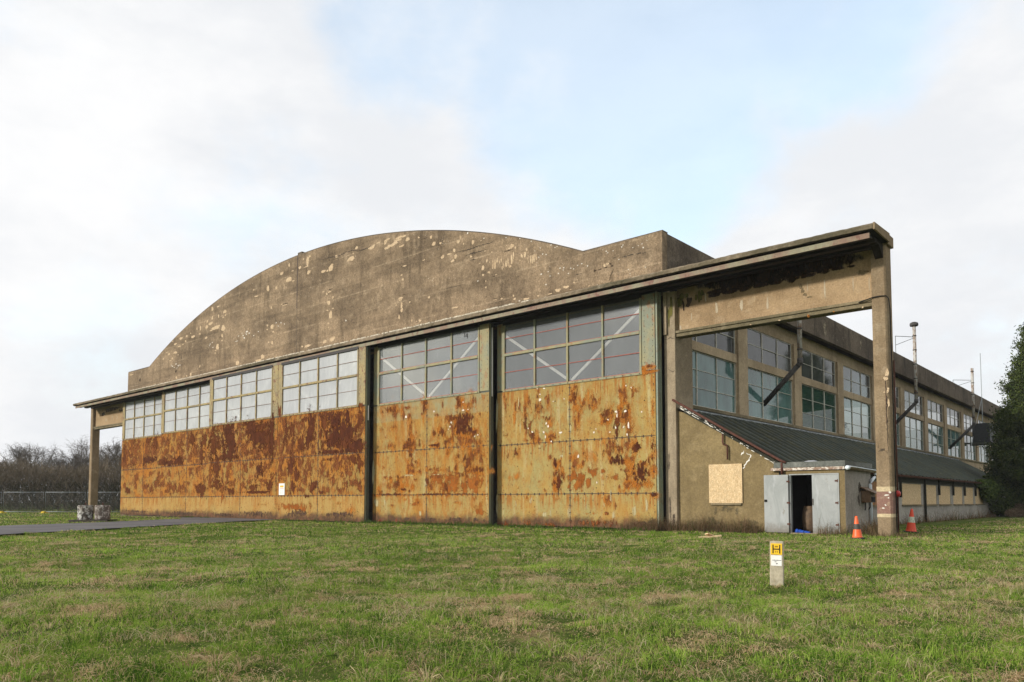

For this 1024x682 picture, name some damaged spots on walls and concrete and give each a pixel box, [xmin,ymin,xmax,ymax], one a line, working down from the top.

peeling [253,235,591,301]
spalling [163,306,226,379]
spalling [301,288,335,348]
corrosion [121,391,488,522]
corrosion [504,364,659,527]